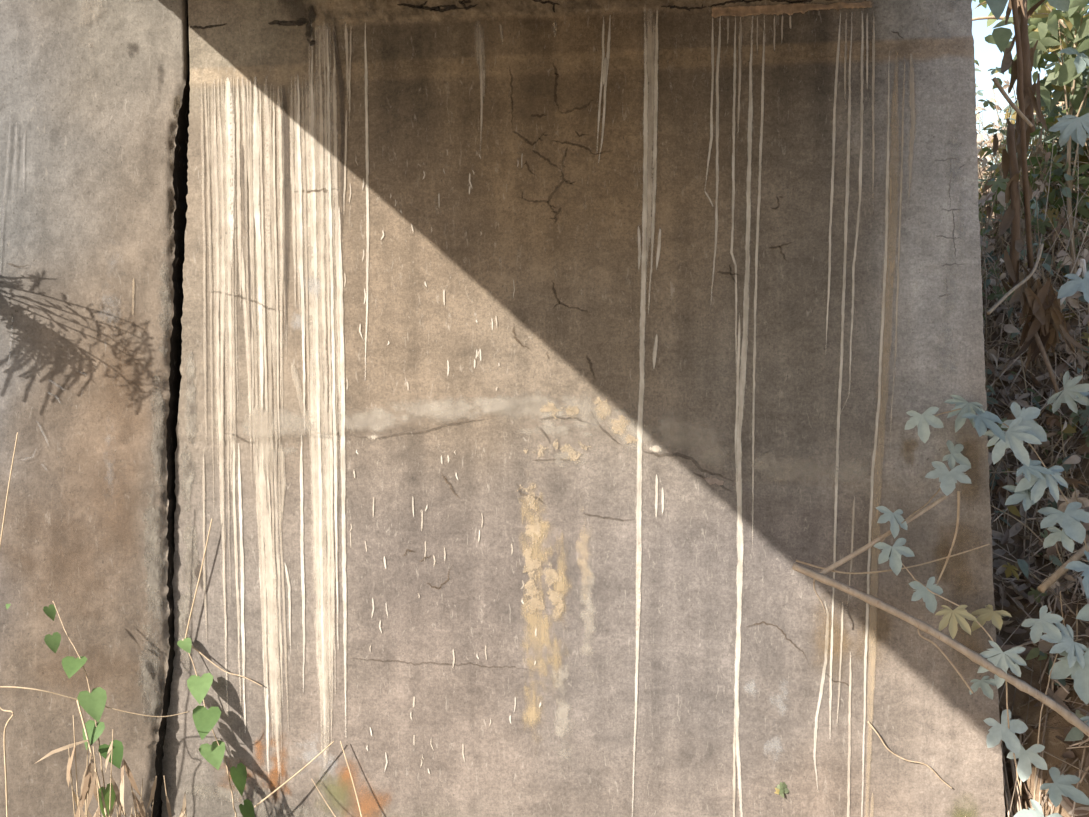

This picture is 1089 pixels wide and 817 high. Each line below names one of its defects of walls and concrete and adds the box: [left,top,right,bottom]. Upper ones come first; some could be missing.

crack [397,0,478,12]
crack [533,0,560,12]
crack [661,0,829,11]
crack [510,66,600,222]
water stain [158,264,172,356]
water stain [177,0,384,779]
water stain [523,8,661,815]
water stain [702,1,916,817]
water stain [138,375,167,720]
water stain [412,498,446,565]
water stain [511,484,567,679]
water stain [655,474,664,516]